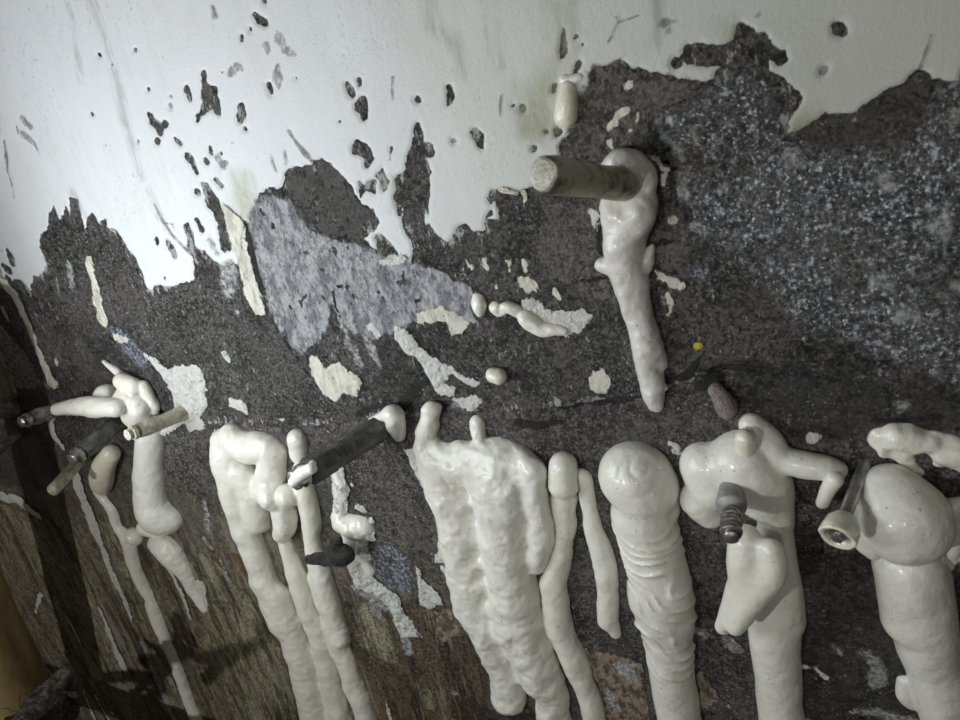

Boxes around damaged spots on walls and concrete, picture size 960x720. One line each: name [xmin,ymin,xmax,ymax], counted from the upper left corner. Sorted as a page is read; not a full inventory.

peeling [240,12,268,42]
peeling [184,70,221,123]
peeling [236,103,247,131]
peeling [345,77,368,121]
peeling [446,84,454,106]
peeling [543,21,960,400]
peeling [0,112,641,427]